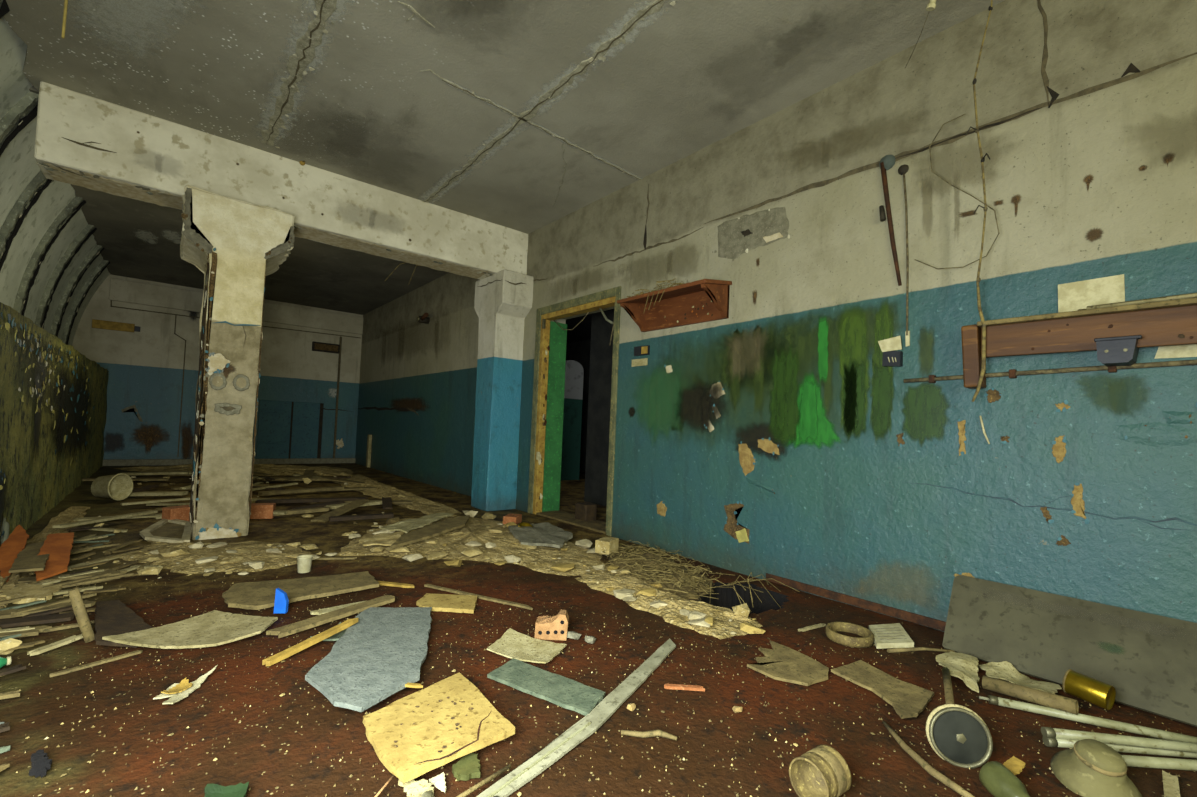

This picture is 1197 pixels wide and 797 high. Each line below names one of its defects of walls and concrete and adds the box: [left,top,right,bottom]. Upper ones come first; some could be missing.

crack [257,0,347,148]
crack [418,0,1197,266]
spalling [714,207,790,261]
peeling [704,381,725,432]
peeling [984,388,1002,403]
peeling [738,437,780,477]
peeling [958,419,967,456]
peeling [1052,435,1067,463]
peeling [657,501,667,517]
peeling [724,501,750,544]
peeling [1040,506,1071,546]
peeling [1071,483,1090,524]